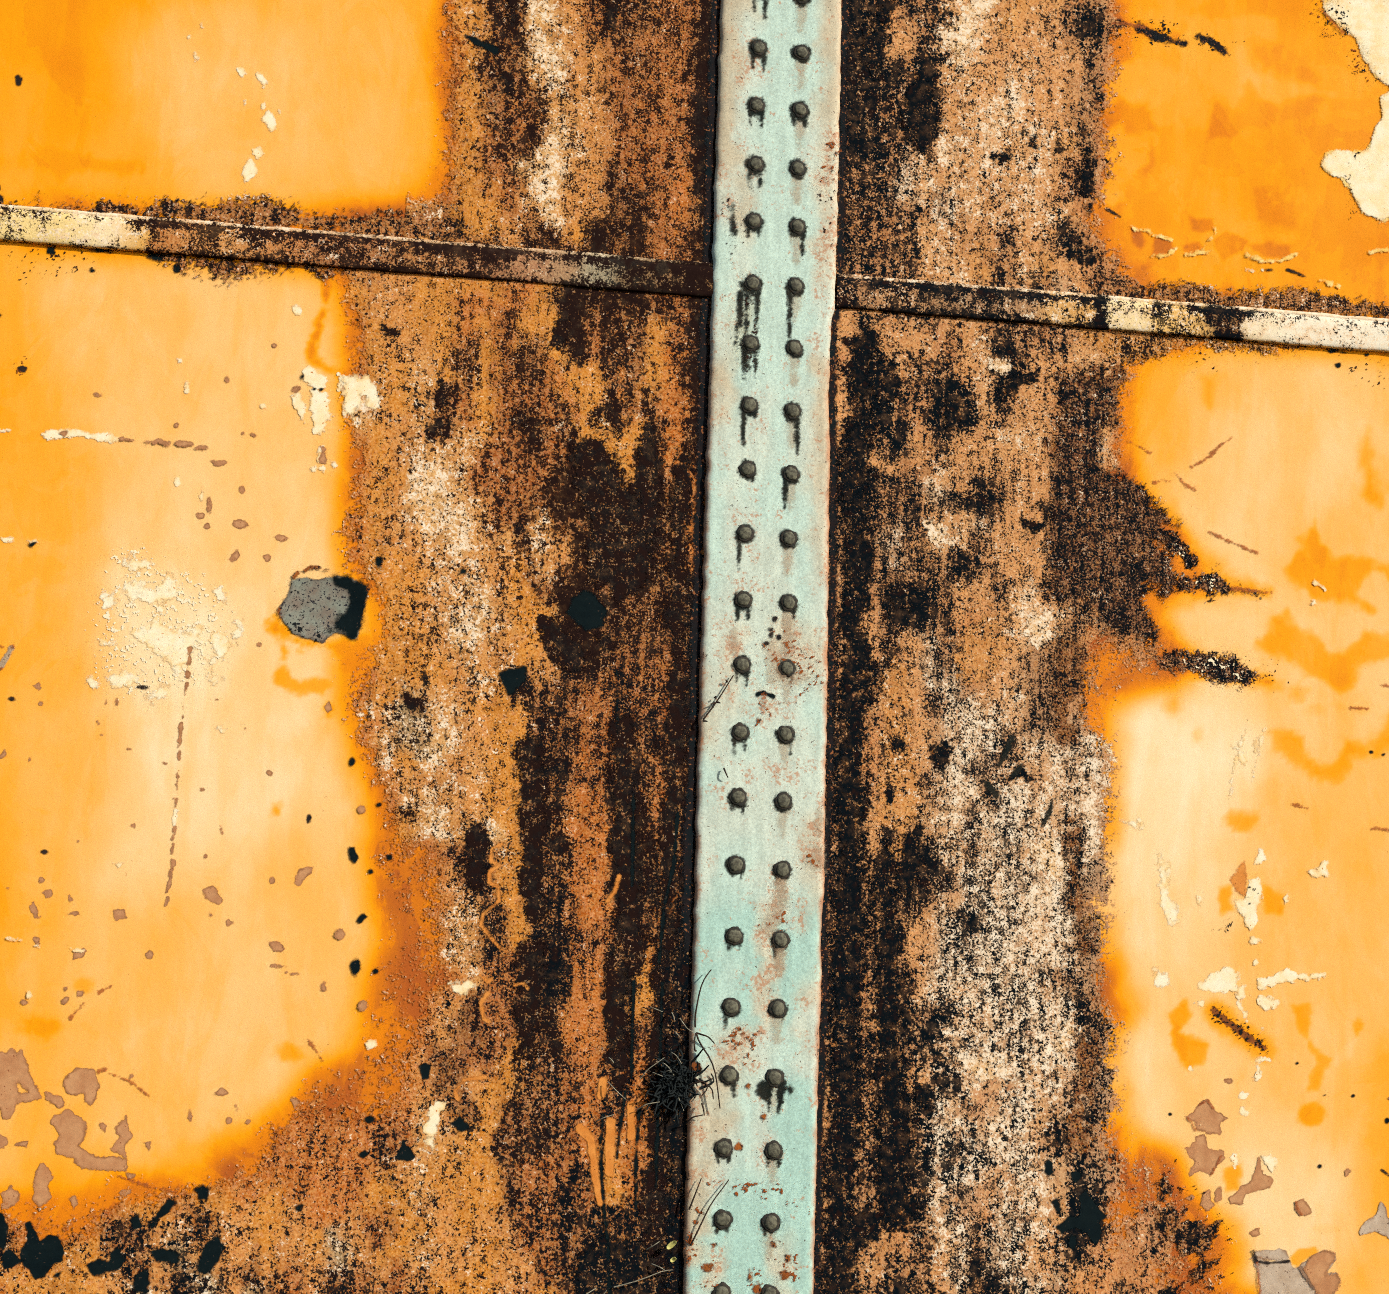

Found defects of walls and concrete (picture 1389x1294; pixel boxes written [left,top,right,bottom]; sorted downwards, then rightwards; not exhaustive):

corrosion [0,0,764,263]
peeling [1309,0,1389,223]
peeling [0,431,391,1026]
corrosion [0,254,732,1294]
corrosion [707,0,1389,1294]
peeling [1194,848,1329,1030]
peeling [0,1048,210,1279]
spalling [87,1247,180,1294]
spalling [197,1236,225,1274]
peeling [395,1101,470,1161]
peeling [1169,1057,1278,1211]
peeling [1250,1228,1341,1294]